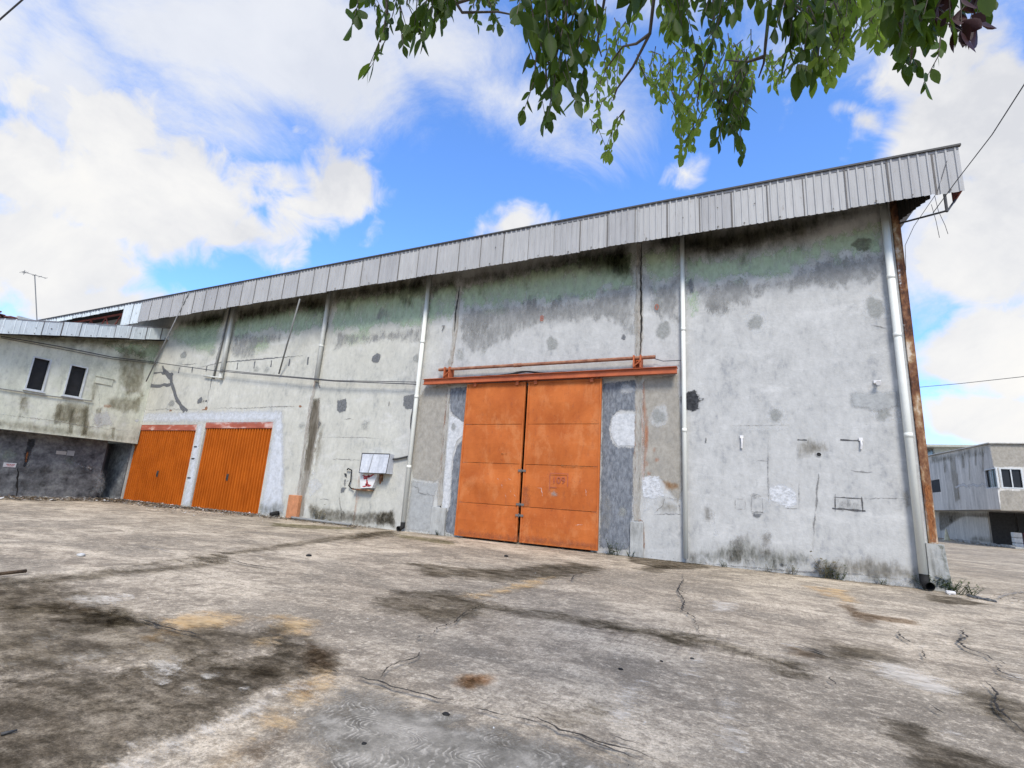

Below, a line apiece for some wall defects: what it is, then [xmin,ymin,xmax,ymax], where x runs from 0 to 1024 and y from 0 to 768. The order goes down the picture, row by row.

damp [337,278,454,298]
damp [474,245,630,281]
damp [655,212,850,254]
damp [300,399,320,516]
crack [677,576,740,644]
crack [333,604,483,700]
crack [957,630,1022,730]
crack [477,708,653,758]